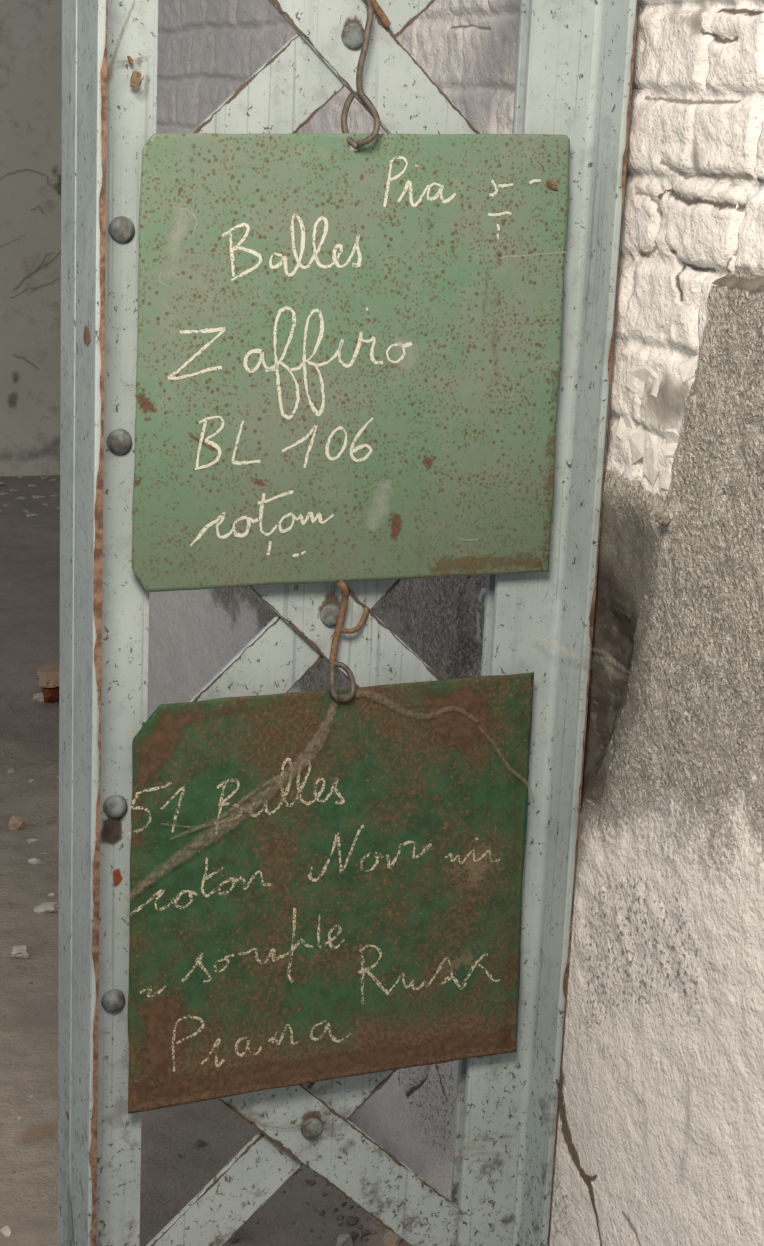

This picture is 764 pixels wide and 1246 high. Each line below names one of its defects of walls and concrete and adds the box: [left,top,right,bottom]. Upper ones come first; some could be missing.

corrosion [74,0,122,1246]
corrosion [192,586,359,702]
corrosion [319,579,444,680]
corrosion [151,1098,413,1246]
corrosion [300,1069,457,1208]
crack [559,1070,641,1246]